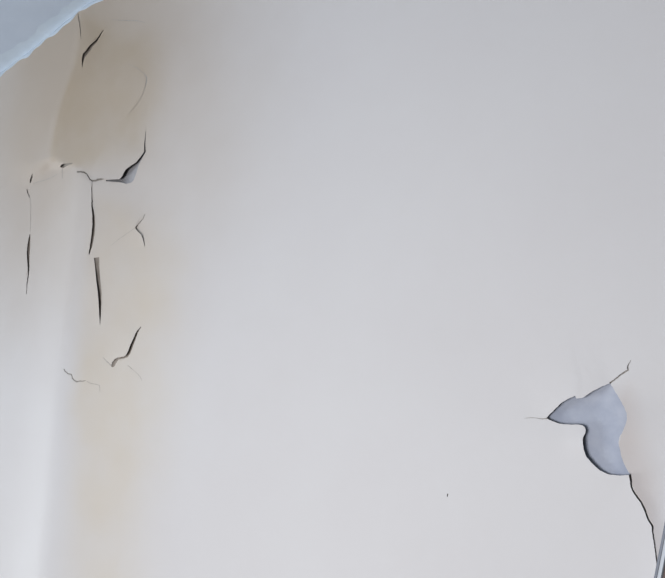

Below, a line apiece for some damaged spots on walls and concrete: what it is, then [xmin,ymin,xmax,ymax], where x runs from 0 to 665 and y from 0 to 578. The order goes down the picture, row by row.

crack [78,15,103,66]
crack [25,174,33,294]
crack [77,171,104,321]
crack [113,214,145,247]
crack [105,327,142,380]
spalling [524,360,665,564]